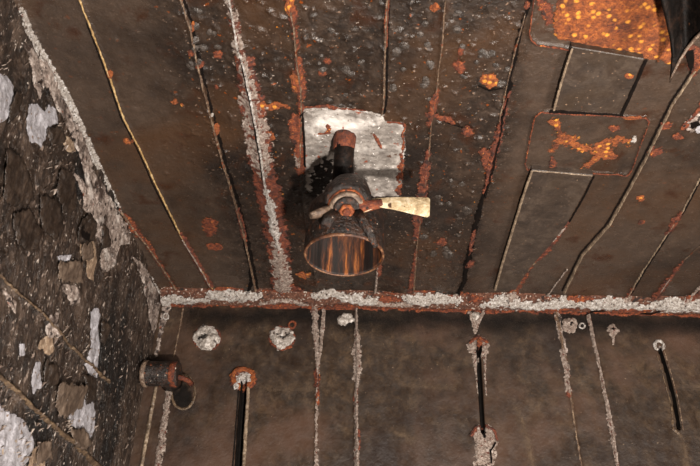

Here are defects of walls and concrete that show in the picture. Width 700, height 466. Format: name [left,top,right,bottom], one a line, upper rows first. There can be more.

peeling [0,42,131,305]
rust [171,0,700,318]
peeling [3,291,17,314]
peeling [132,257,172,357]
peeling [31,308,112,451]
peeling [0,404,54,466]
crack [481,432,496,464]